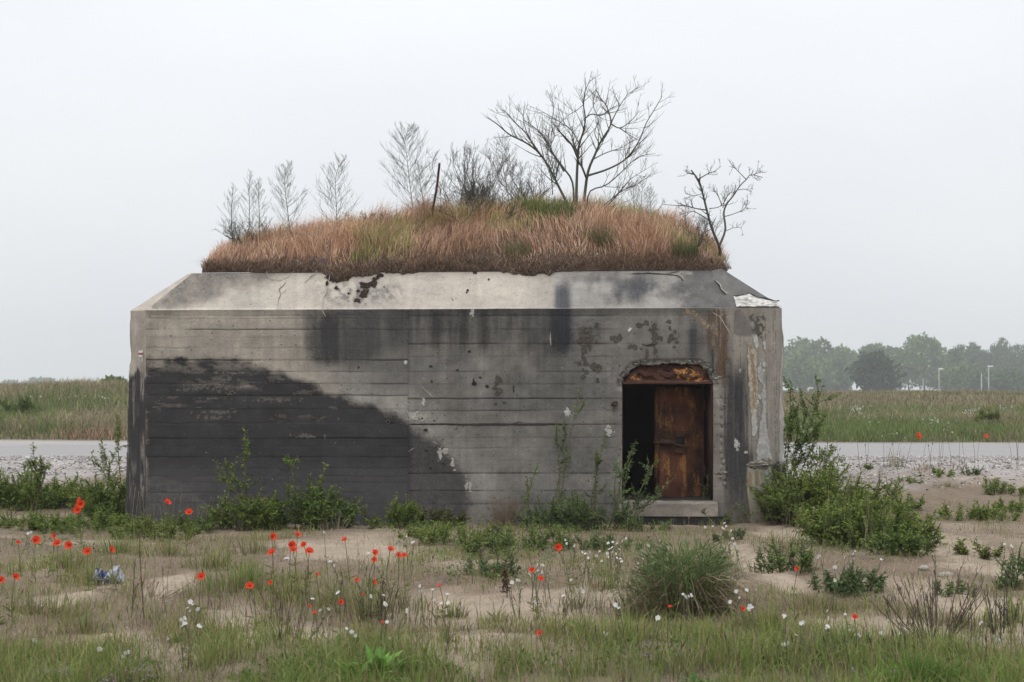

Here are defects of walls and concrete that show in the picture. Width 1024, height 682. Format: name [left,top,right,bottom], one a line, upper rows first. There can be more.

leakage [307,287,570,360]
peeling [576,320,717,384]
corrosion [673,308,727,381]
spalling [733,292,782,337]
leakage [125,357,465,526]